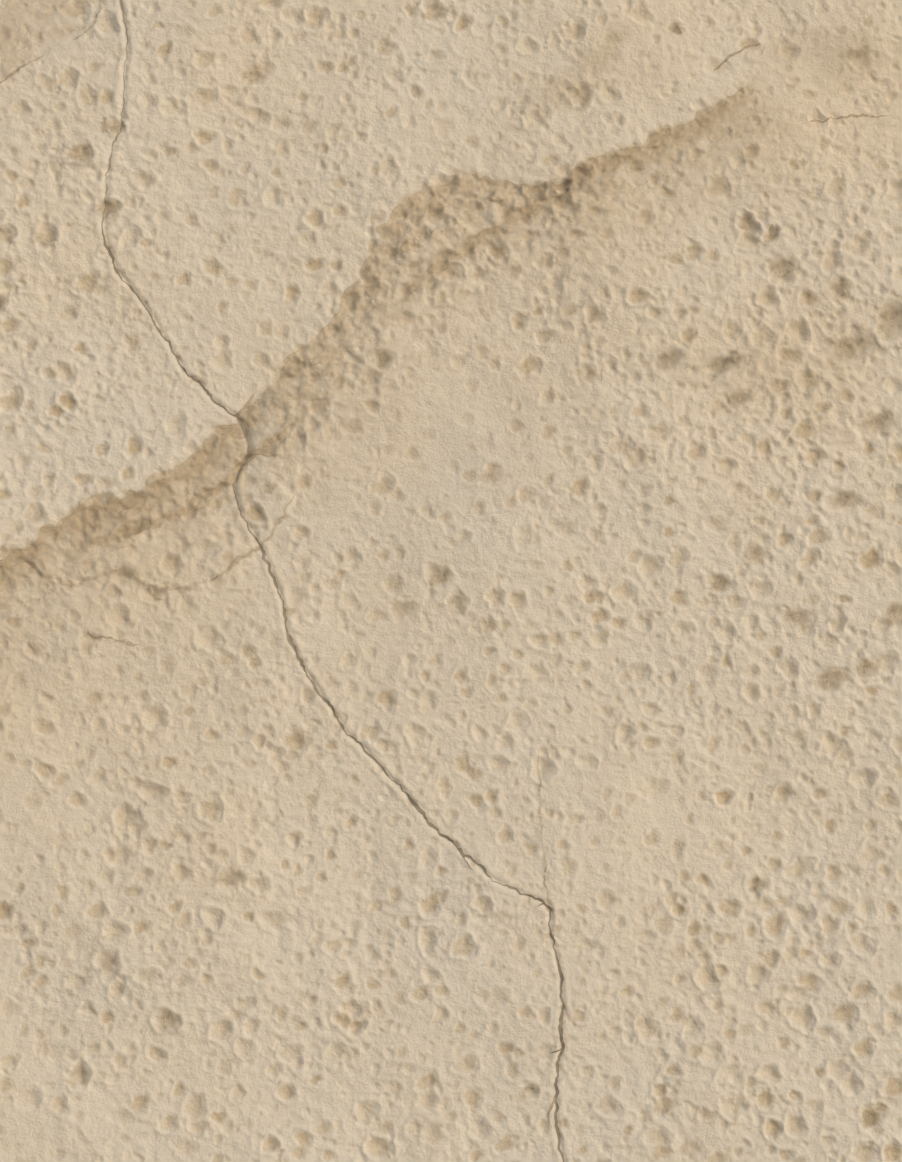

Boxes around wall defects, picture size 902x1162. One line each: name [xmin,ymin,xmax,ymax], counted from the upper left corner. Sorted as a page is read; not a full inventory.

flaking render [278,87,753,402]
crack [13,555,55,584]
flaking render [0,405,293,610]
crack [102,214,565,1162]